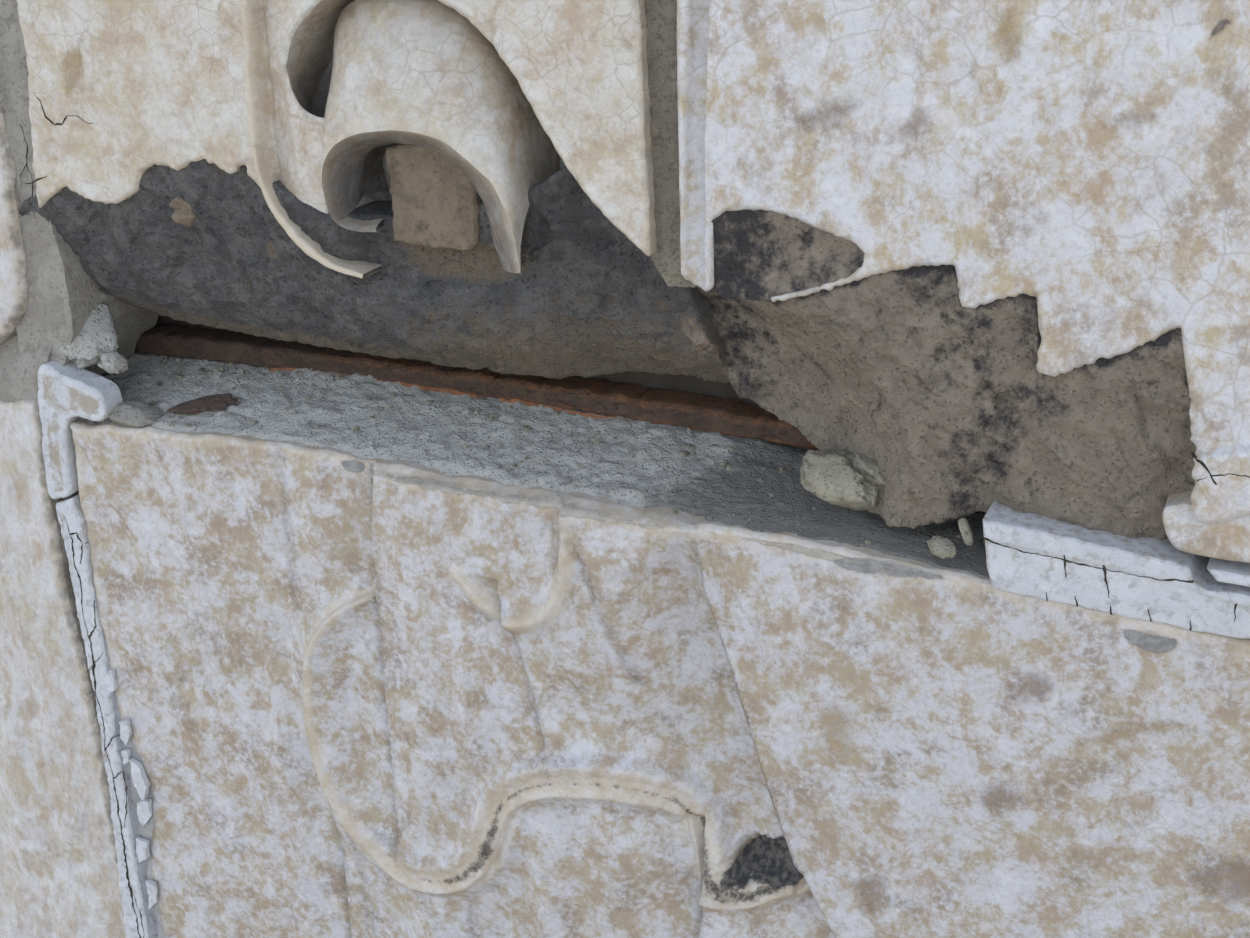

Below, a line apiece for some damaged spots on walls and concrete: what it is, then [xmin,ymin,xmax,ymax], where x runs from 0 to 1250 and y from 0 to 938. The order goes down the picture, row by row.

crack [20,98,93,217]
spalling [19,159,1197,540]
crack [64,517,144,938]
crack [984,537,1194,615]